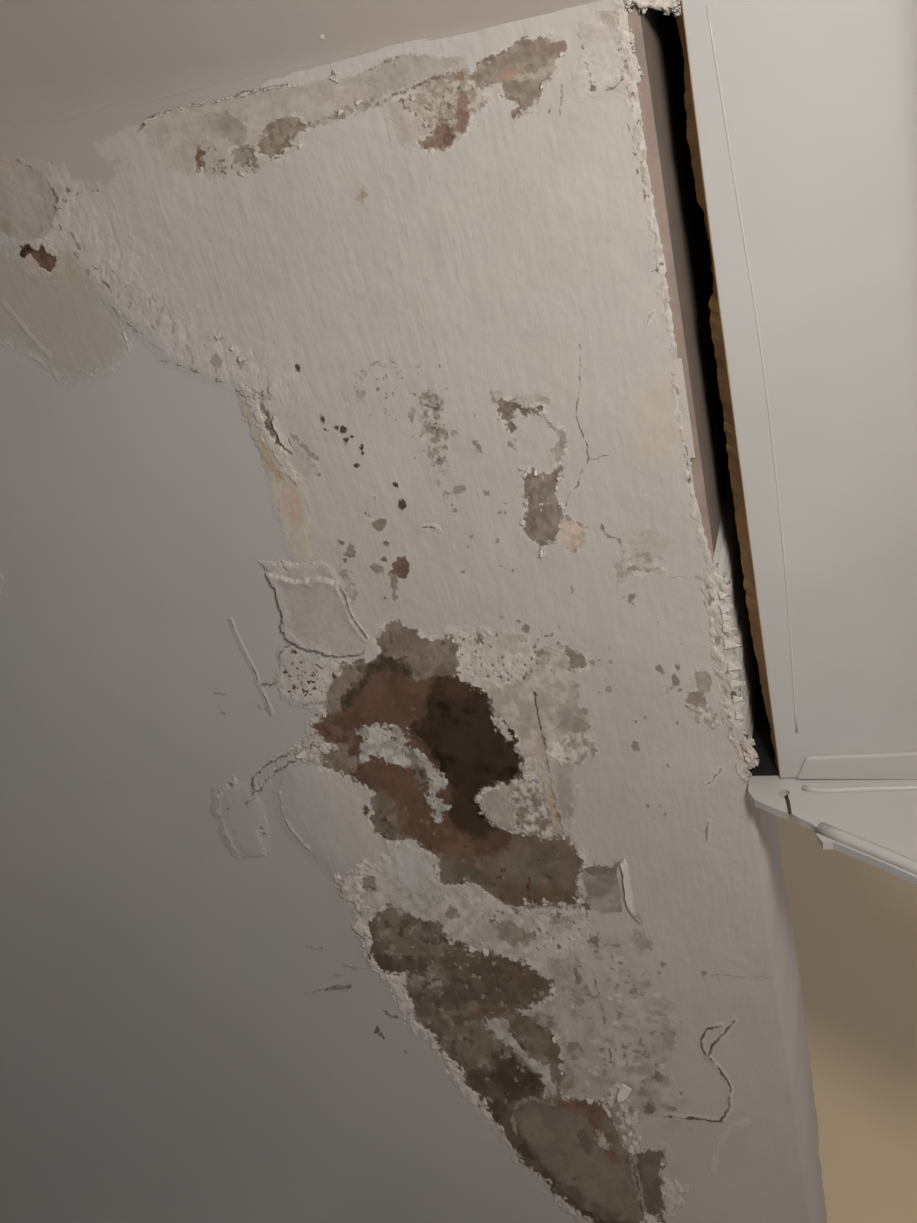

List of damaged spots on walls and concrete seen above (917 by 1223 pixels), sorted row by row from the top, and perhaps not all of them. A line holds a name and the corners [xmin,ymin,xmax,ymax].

flaking render [9,229,69,287]
peeling [136,0,756,783]
crack [565,343,609,506]
flaking render [263,482,698,1223]
crack [532,691,615,1073]
crack [661,1015,738,1124]
crack [619,1106,650,1223]